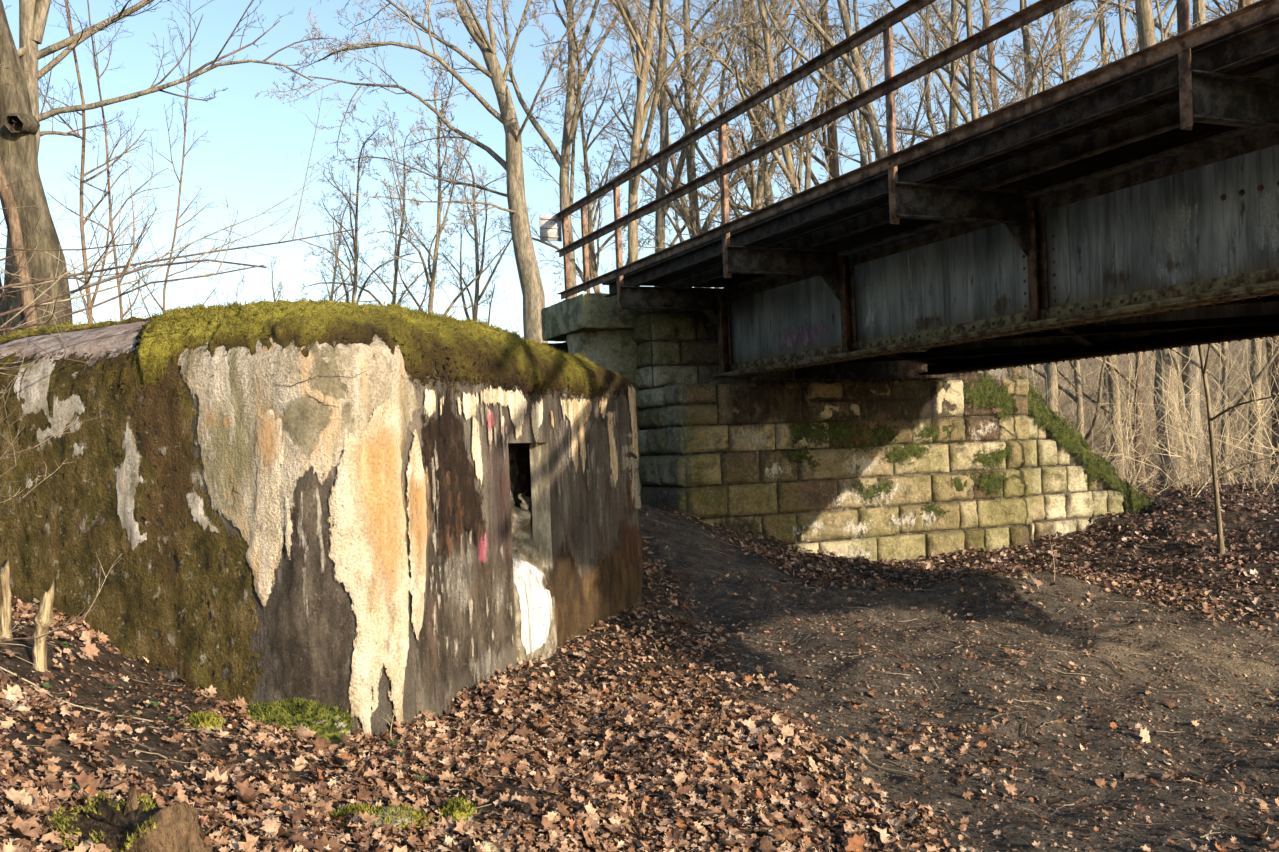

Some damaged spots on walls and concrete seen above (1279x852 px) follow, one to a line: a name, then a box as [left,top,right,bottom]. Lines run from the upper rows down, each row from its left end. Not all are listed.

spalling [0,321,149,459]
peeling [178,334,419,546]
damp [245,384,643,734]